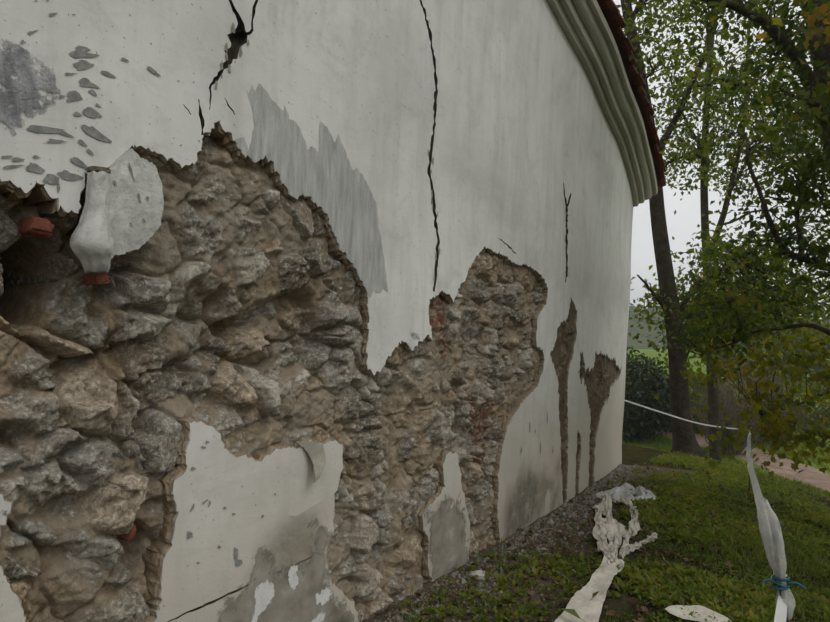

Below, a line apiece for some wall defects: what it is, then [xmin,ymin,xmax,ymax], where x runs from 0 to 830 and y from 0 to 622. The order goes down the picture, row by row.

peeling [0,30,116,155]
crack [183,0,258,135]
crack [420,0,440,292]
spalling [0,84,621,622]
crack [168,584,249,622]